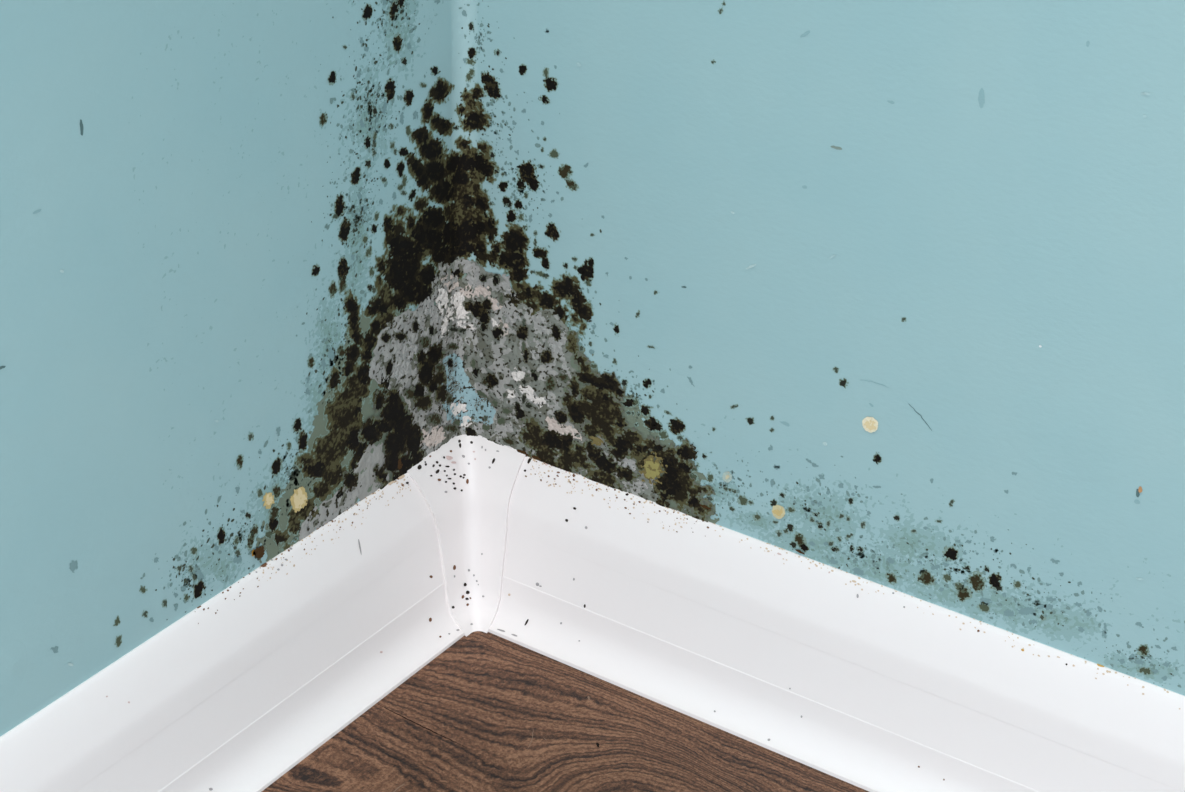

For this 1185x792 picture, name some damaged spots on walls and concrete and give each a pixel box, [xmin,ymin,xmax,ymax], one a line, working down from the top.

peeling [369,257,658,502]
damp [139,0,1185,688]
damp [113,616,122,648]